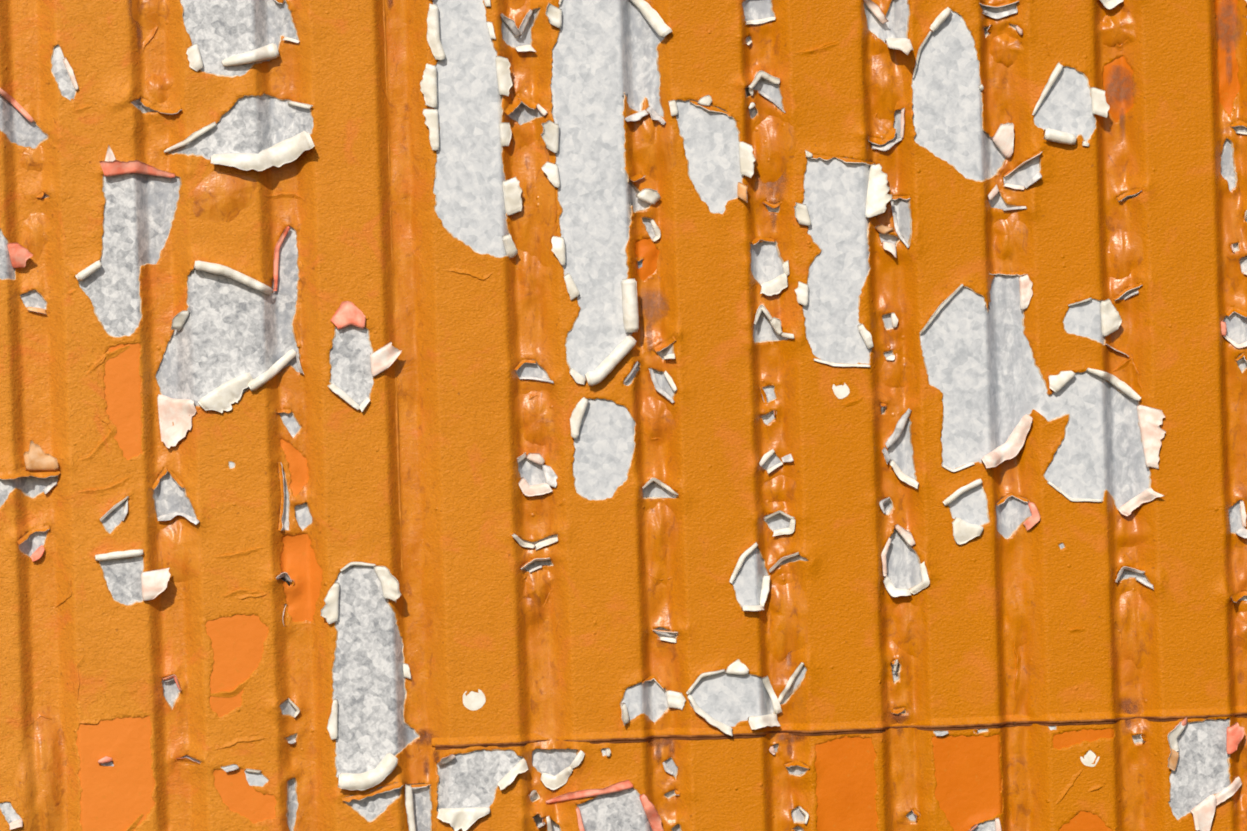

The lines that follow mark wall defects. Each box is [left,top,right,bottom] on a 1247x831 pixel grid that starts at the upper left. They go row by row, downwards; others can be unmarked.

peeling [180,0,300,76]
peeling [0,88,47,149]
peeling [164,95,315,171]
peeling [742,0,1142,367]
peeling [76,146,304,460]
peeling [420,0,756,500]
peeling [152,466,199,525]
peeling [882,408,919,489]
peeling [920,271,1166,545]
peeling [275,409,680,831]
peeling [621,659,806,736]
peeling [1168,716,1245,831]